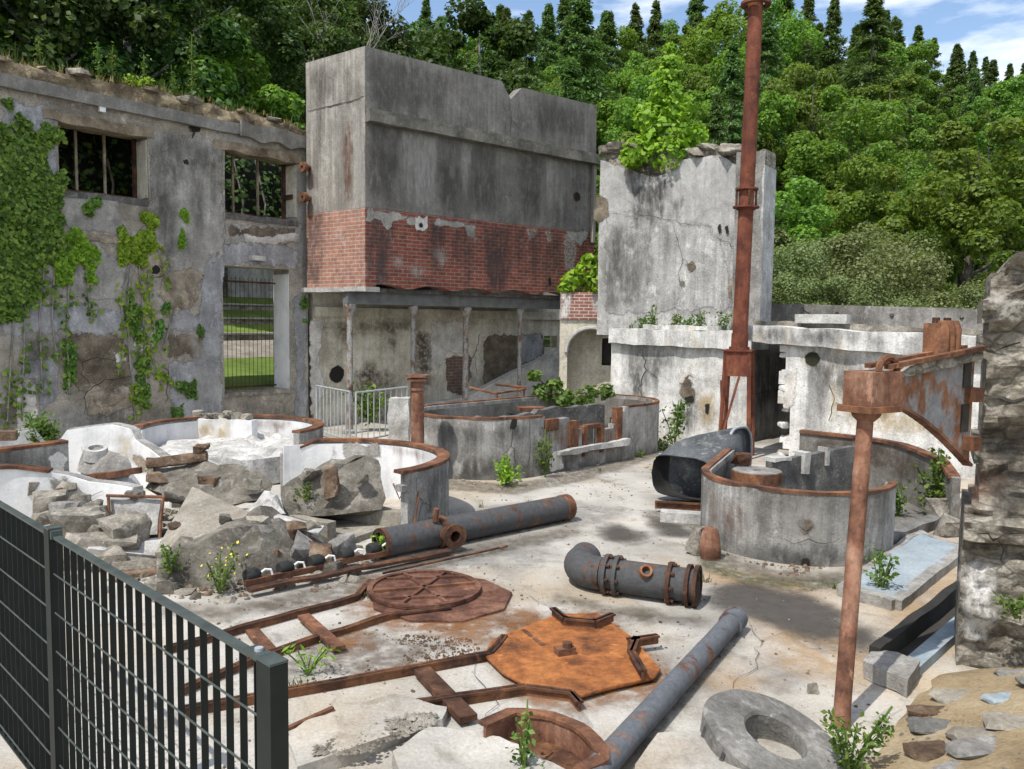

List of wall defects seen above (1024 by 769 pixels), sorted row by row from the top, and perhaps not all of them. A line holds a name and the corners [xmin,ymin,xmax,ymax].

spalling [229,225,299,245]
peeling [527,229,576,271]
peeling [594,196,733,316]
crack [66,346,133,414]
peeling [426,320,472,395]
spalling [679,370,695,403]